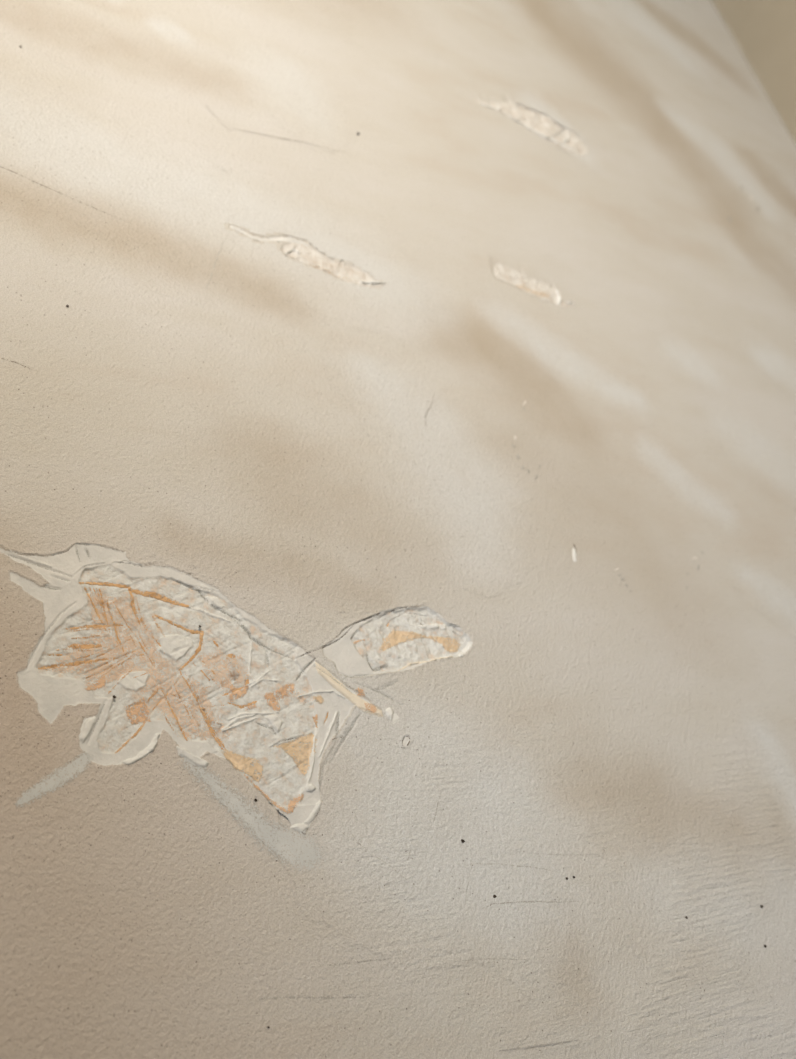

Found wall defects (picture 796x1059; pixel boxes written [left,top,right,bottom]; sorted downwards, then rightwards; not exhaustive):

flaking render [474,99,588,156]
flaking render [493,263,576,307]
flaking render [0,542,473,874]